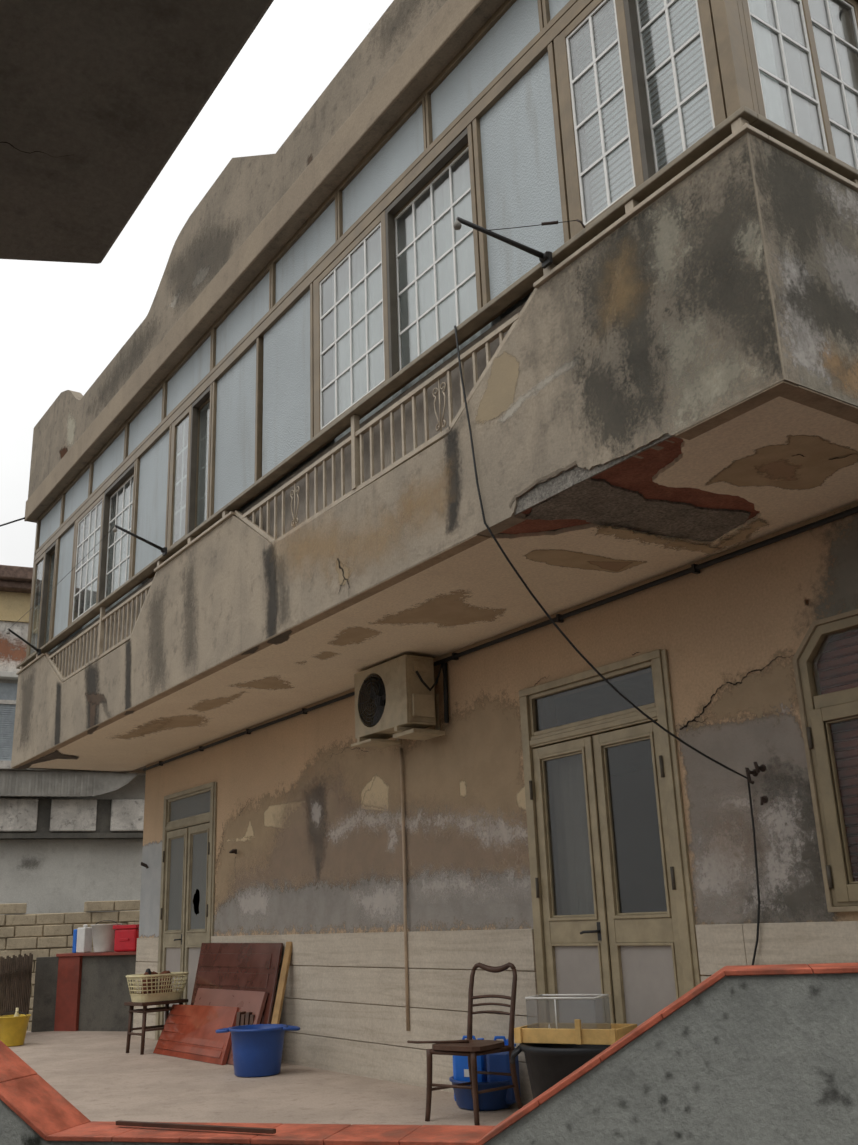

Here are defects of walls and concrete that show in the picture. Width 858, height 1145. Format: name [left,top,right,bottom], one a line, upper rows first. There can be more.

leakage [574,149,858,451]
leakage [445,429,460,531]
flaking render [500,434,858,556]
leakage [263,545,278,639]
crack [336,558,351,597]
peeling [298,590,504,664]
peeling [525,549,646,573]
peeling [114,675,294,739]
crack [680,651,797,731]
peeling [215,693,530,911]
leakage [234,780,528,892]